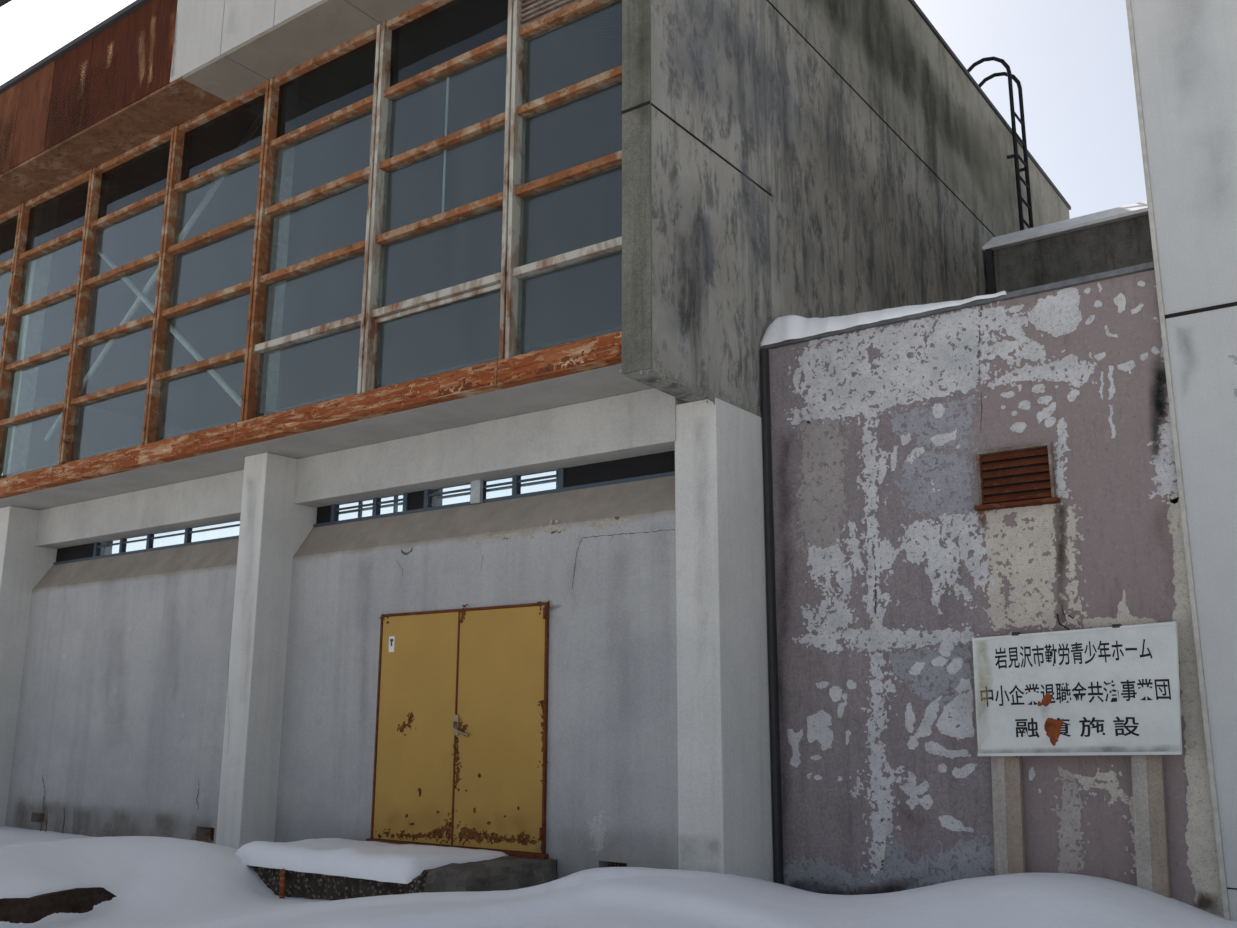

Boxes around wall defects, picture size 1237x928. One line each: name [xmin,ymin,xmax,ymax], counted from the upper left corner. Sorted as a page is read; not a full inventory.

rust [170,332,622,456]
crack [571,529,675,593]
peeling [783,282,1160,895]
peeling [1147,383,1224,917]
rust [397,712,416,736]
rust [452,718,469,792]
rust [375,806,539,846]